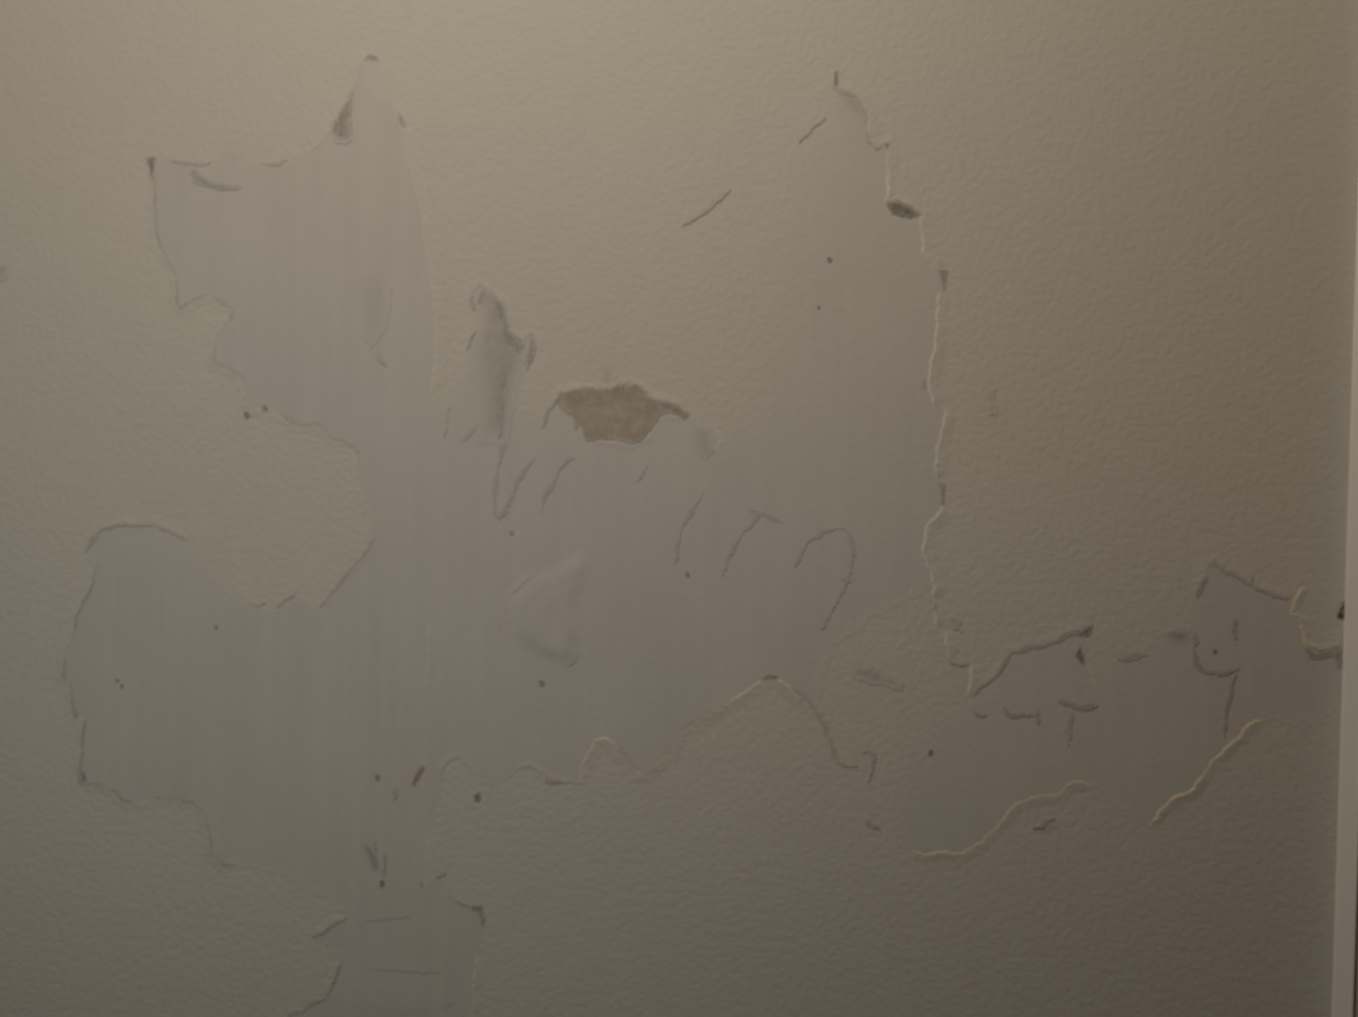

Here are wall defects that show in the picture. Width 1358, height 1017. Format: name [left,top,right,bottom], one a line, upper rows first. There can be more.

spalling [542,377,692,451]
peeling [54,51,449,912]
crack [972,699,1098,745]